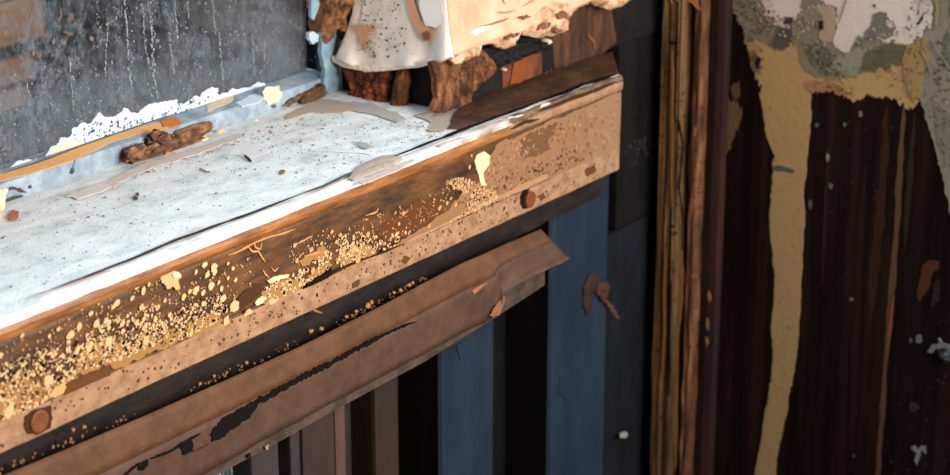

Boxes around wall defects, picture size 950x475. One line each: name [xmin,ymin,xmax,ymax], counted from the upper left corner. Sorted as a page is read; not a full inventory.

peeling [306,31,319,44]
flaking render [406,0,435,42]
spalling [448,0,630,65]
peeling [855,4,896,47]
peeling [235,85,282,108]
peeling [726,81,742,154]
corrosion [520,189,530,209]
peeling [267,274,290,283]
peeling [47,261,277,355]
peeling [43,375,66,398]
corrosion [23,405,53,435]
peeling [210,406,258,442]